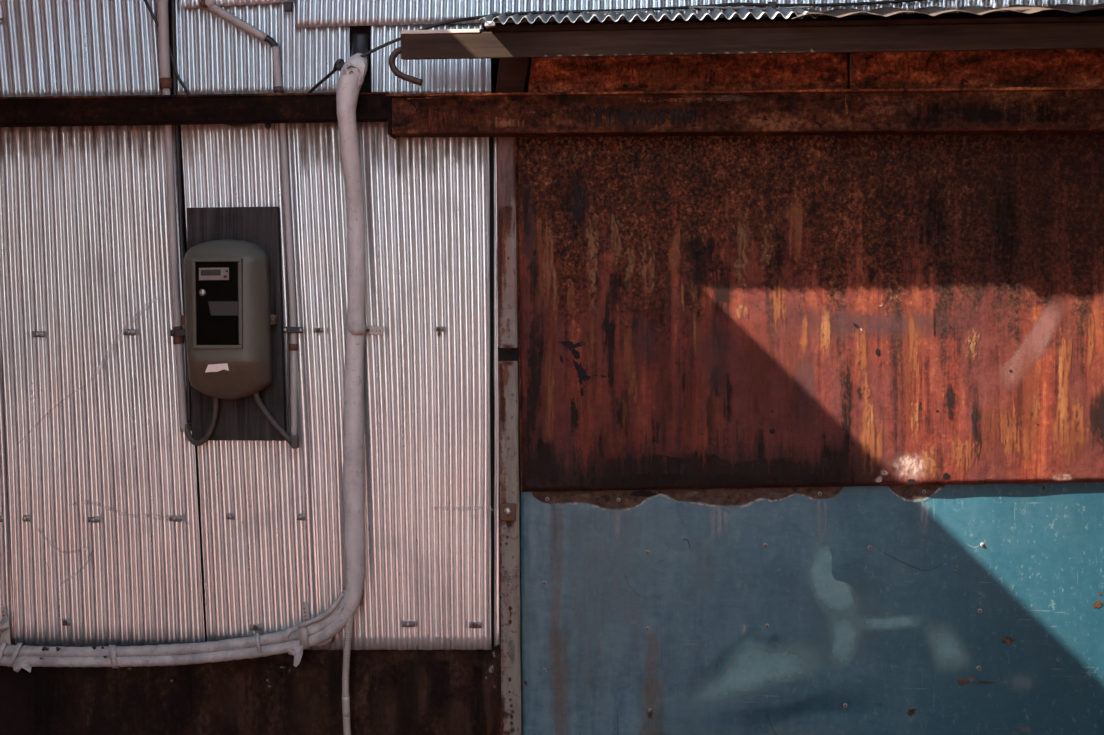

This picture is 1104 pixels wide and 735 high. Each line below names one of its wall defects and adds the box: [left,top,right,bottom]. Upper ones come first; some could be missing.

rust [497,206,512,307]
rust [499,345,513,423]
rust [525,216,575,311]
rust [587,216,655,308]
rust [665,228,697,348]
rust [773,277,786,319]
rust [787,201,803,259]
rust [821,317,830,350]
rust [856,331,881,464]
rust [901,320,920,428]
peeling [532,487,843,512]
rust [499,677,514,735]